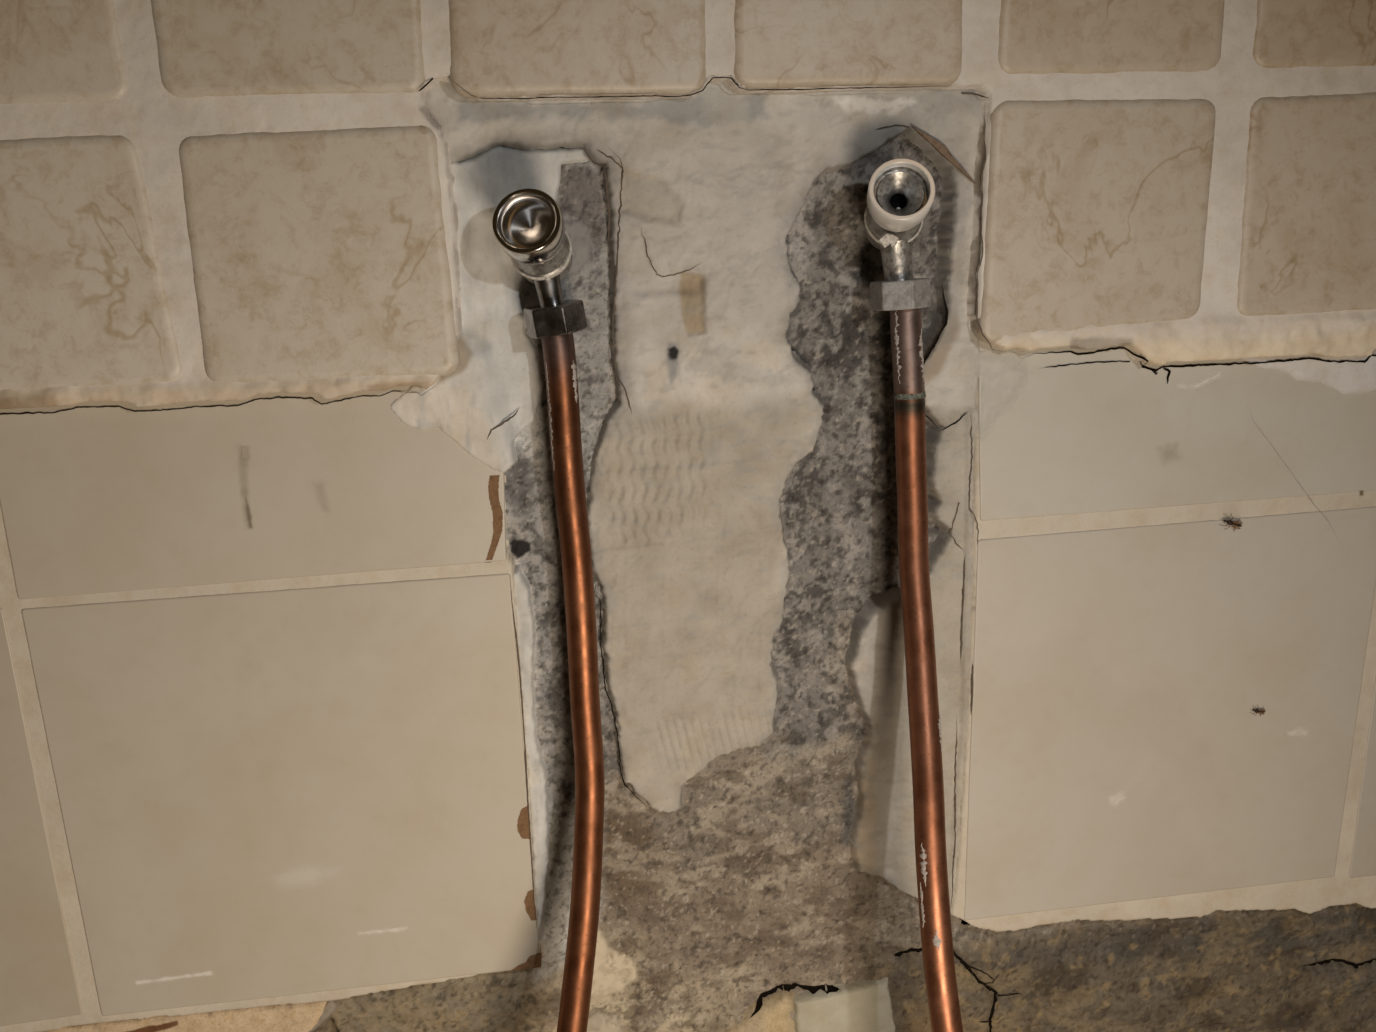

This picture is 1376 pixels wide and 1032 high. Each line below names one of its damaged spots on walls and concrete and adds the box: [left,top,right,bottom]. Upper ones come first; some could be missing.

spalling [556,147,616,502]
spalling [43,279,575,1032]
spalling [588,126,975,1032]
spalling [951,903,1376,1032]
crack [1305,959,1376,968]